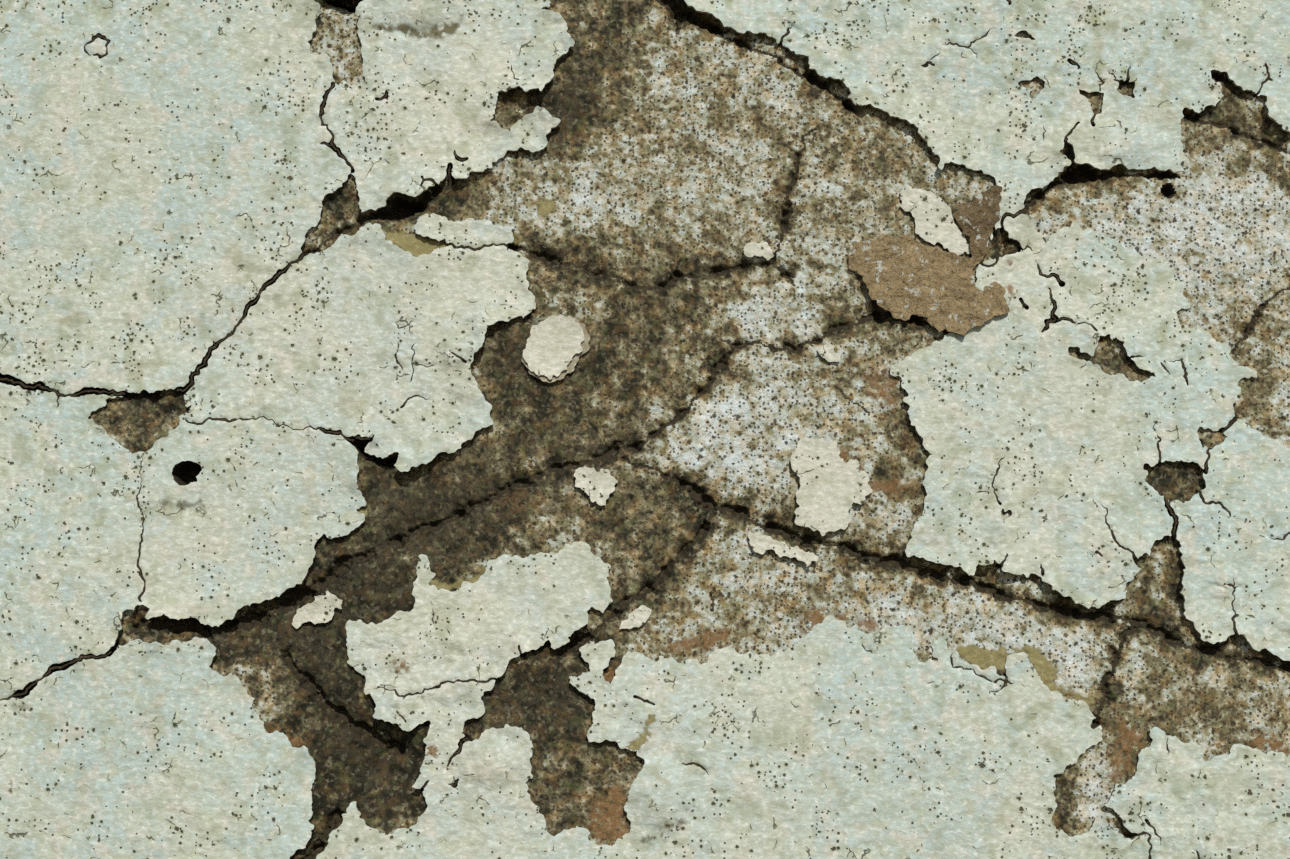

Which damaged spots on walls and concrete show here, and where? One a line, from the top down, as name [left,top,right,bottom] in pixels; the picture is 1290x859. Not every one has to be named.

crack [319,83,355,176]
crack [0,216,374,448]
crack [447,127,817,291]
peeling [848,185,1022,336]
peeling [1018,71,1290,449]
crack [0,312,1290,756]
peeling [747,531,819,567]
peeling [790,437,873,536]
peeling [1143,461,1204,503]
crack [303,809,344,859]
crack [421,735,469,790]
peeling [462,640,645,845]